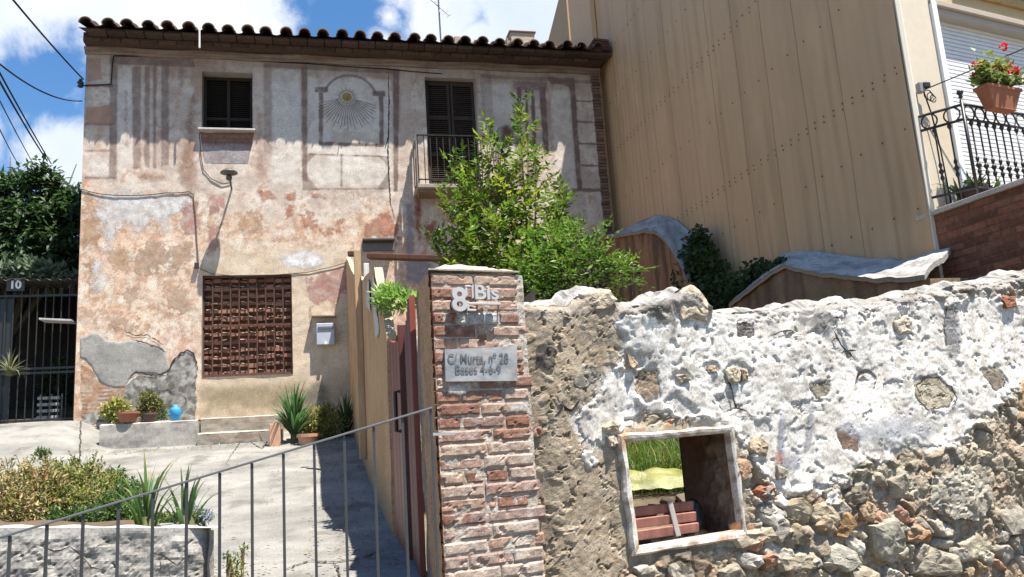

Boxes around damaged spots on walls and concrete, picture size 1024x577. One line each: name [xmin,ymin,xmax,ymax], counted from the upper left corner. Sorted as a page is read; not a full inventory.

flaking render [80,351,197,425]
flaking render [573,291,1024,509]